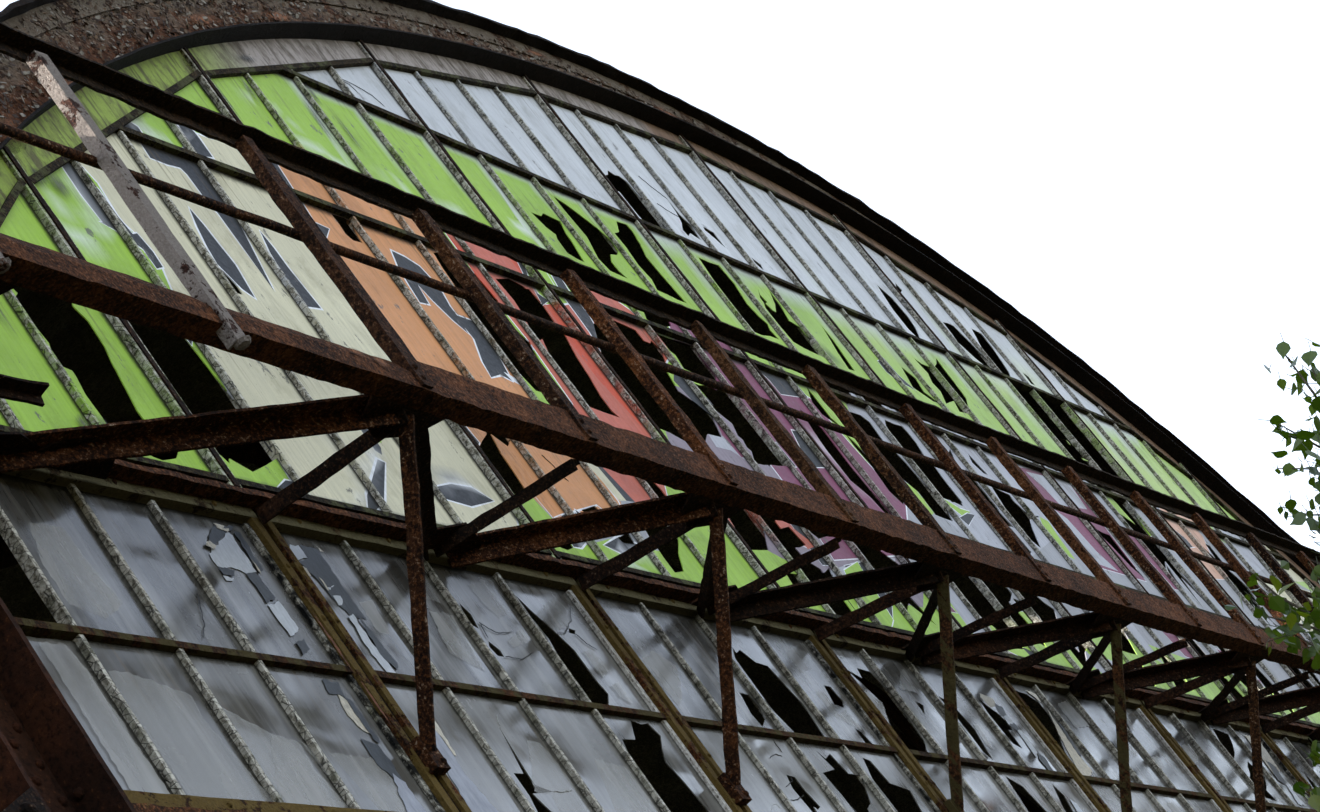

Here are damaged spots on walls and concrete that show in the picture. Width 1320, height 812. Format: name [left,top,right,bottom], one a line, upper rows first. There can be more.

peeling [206,523,310,655]
peeling [290,544,398,673]
peeling [322,679,426,812]